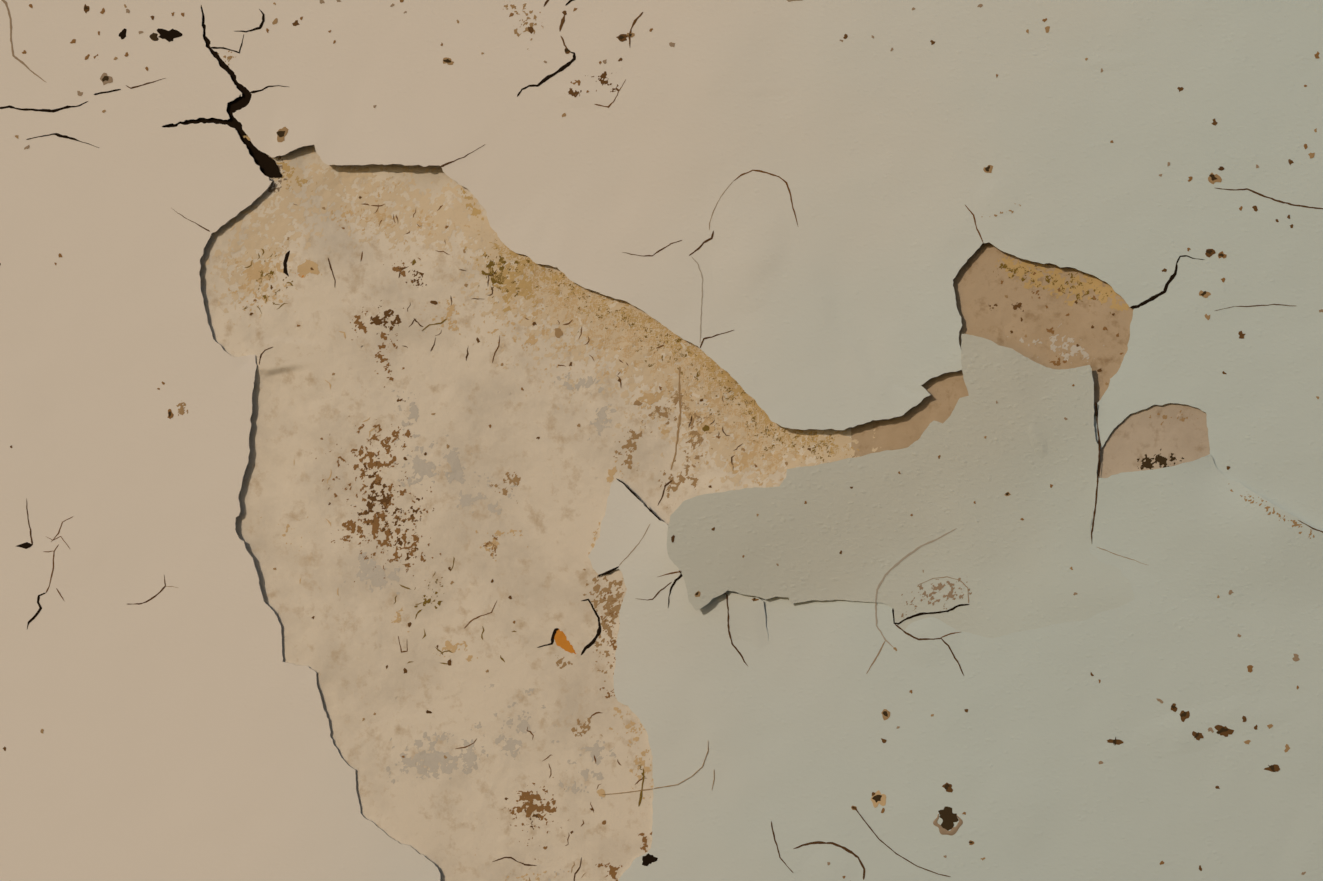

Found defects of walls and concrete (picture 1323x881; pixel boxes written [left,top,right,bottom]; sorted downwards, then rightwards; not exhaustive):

crack [0,0,165,148]
crack [162,5,296,205]
crack [517,0,576,97]
crack [328,203,628,386]
crack [1130,255,1204,309]
crack [26,499,72,629]
crack [395,170,798,666]
spalling [200,127,1323,881]